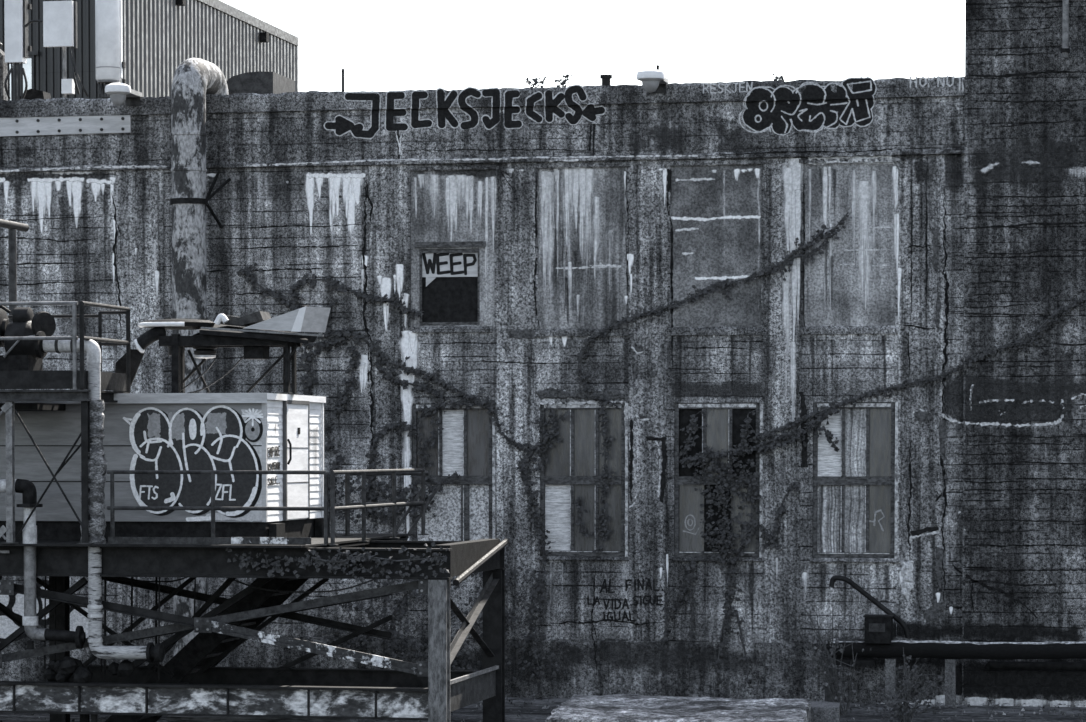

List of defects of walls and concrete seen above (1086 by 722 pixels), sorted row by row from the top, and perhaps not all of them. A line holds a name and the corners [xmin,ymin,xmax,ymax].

leakage [0,170,116,282]
leakage [144,244,159,296]
leakage [305,172,365,235]
leakage [415,163,523,276]
leakage [541,159,610,318]
leakage [625,254,634,304]
crack [207,147,1086,619]